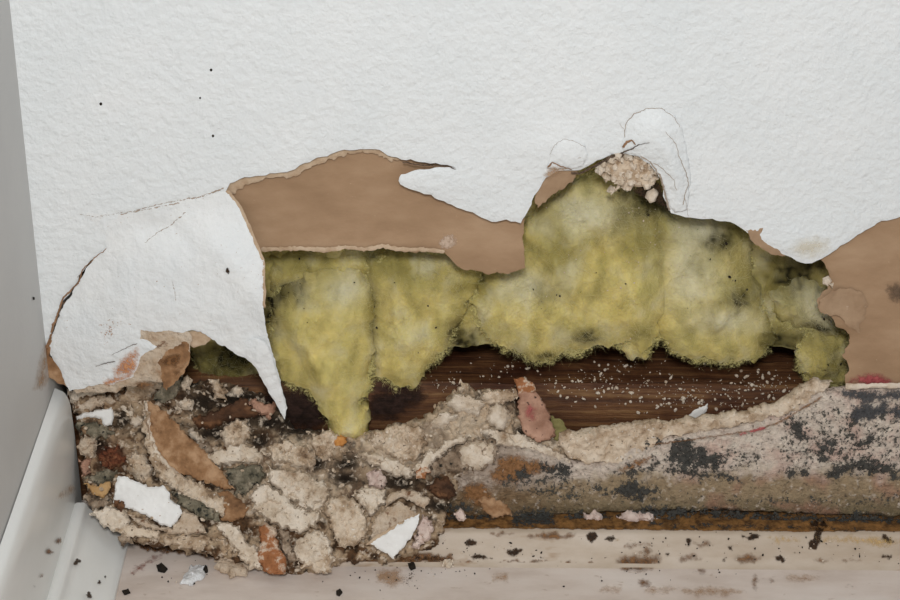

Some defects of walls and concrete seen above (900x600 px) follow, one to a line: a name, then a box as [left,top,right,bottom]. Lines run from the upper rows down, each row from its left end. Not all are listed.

crack [116,188,223,243]
flaking render [595,153,667,210]
crack [45,249,106,349]
peeling [49,190,287,419]
peeling [76,407,114,427]
flaking render [558,377,833,465]
peeling [113,476,182,527]
water stain [443,388,900,563]